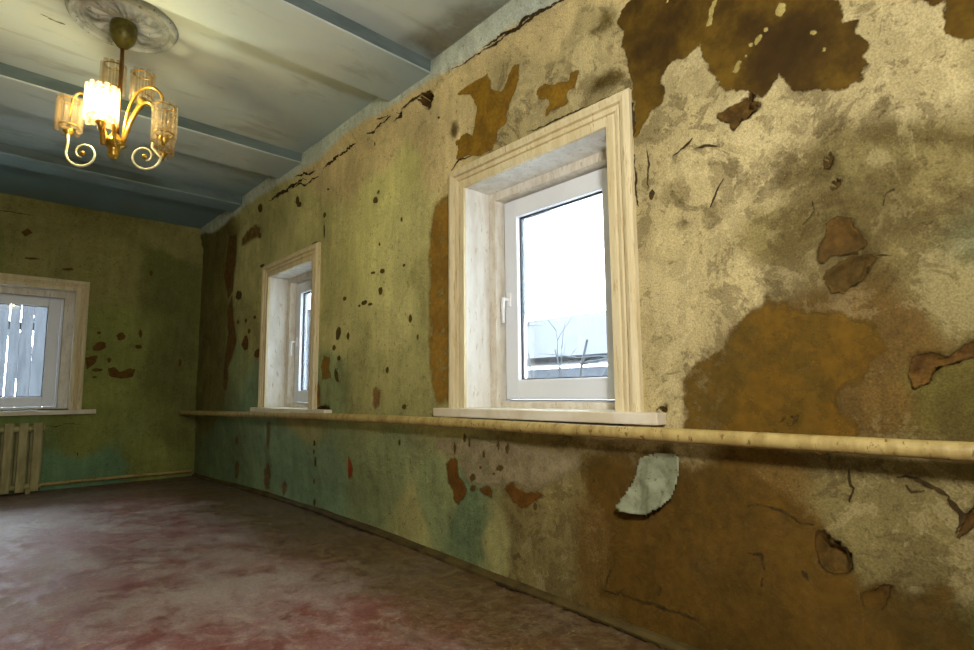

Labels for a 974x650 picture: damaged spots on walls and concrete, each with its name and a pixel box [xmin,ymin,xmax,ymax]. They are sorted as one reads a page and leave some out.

peeling [456,64,519,159]
crack [452,0,564,69]
peeling [537,70,579,116]
peeling [617,0,869,138]
peeling [924,0,974,40]
crack [268,94,422,201]
peeling [417,196,449,404]
peeling [683,296,886,437]
flaking render [437,434,577,491]
peeling [616,453,679,515]
spalling [815,529,853,575]
spalling [957,508,974,538]